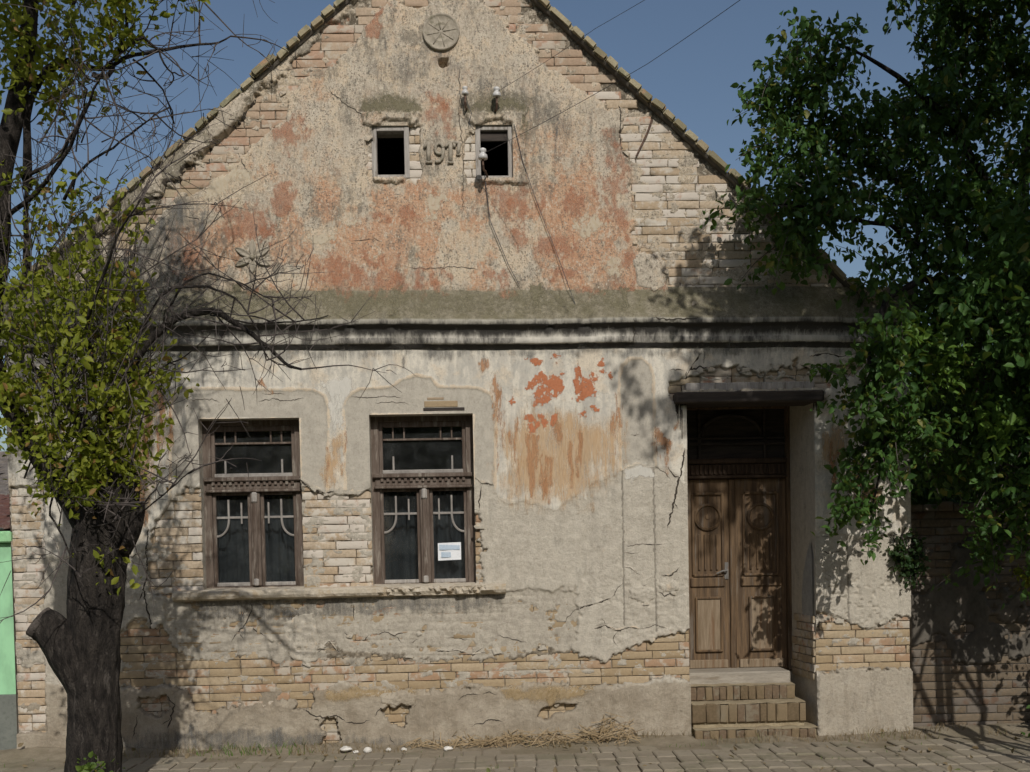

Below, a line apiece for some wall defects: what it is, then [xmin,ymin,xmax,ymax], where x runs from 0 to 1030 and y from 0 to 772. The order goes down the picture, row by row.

spalling [478,0,841,287]
peeling [524,354,613,435]
spalling [668,351,860,405]
crack [565,450,685,644]
spalling [119,486,690,717]
spalling [791,543,910,680]
spalling [321,717,341,744]
spalling [380,704,411,727]
spalling [538,704,575,720]